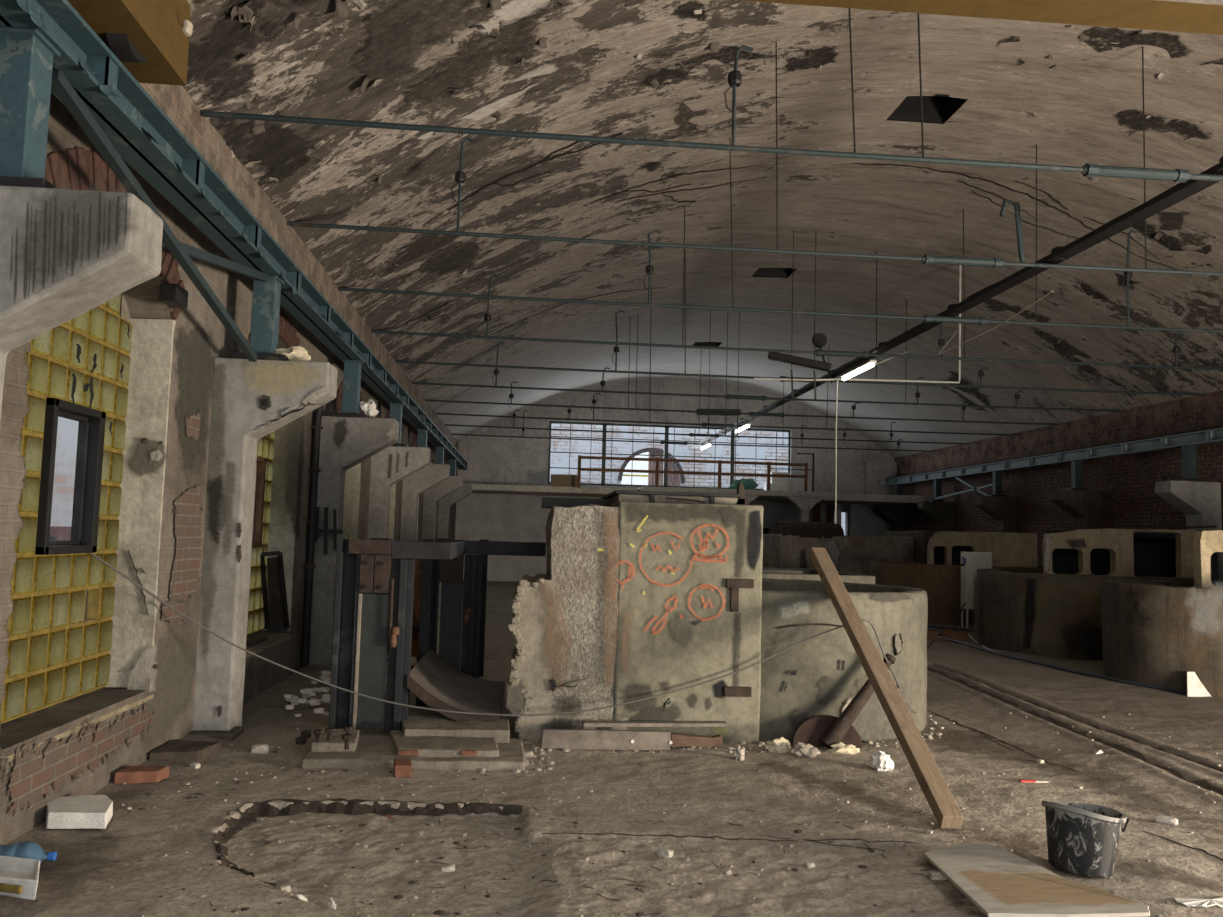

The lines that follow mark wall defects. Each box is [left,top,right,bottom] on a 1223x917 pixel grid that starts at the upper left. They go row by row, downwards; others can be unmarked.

crack [448,133,623,211]
crack [584,165,767,206]
crack [828,163,1192,276]
spalling [0,342,31,708]
spalling [506,680,530,714]
crack [927,710,1075,771]
crack [1143,831,1223,860]